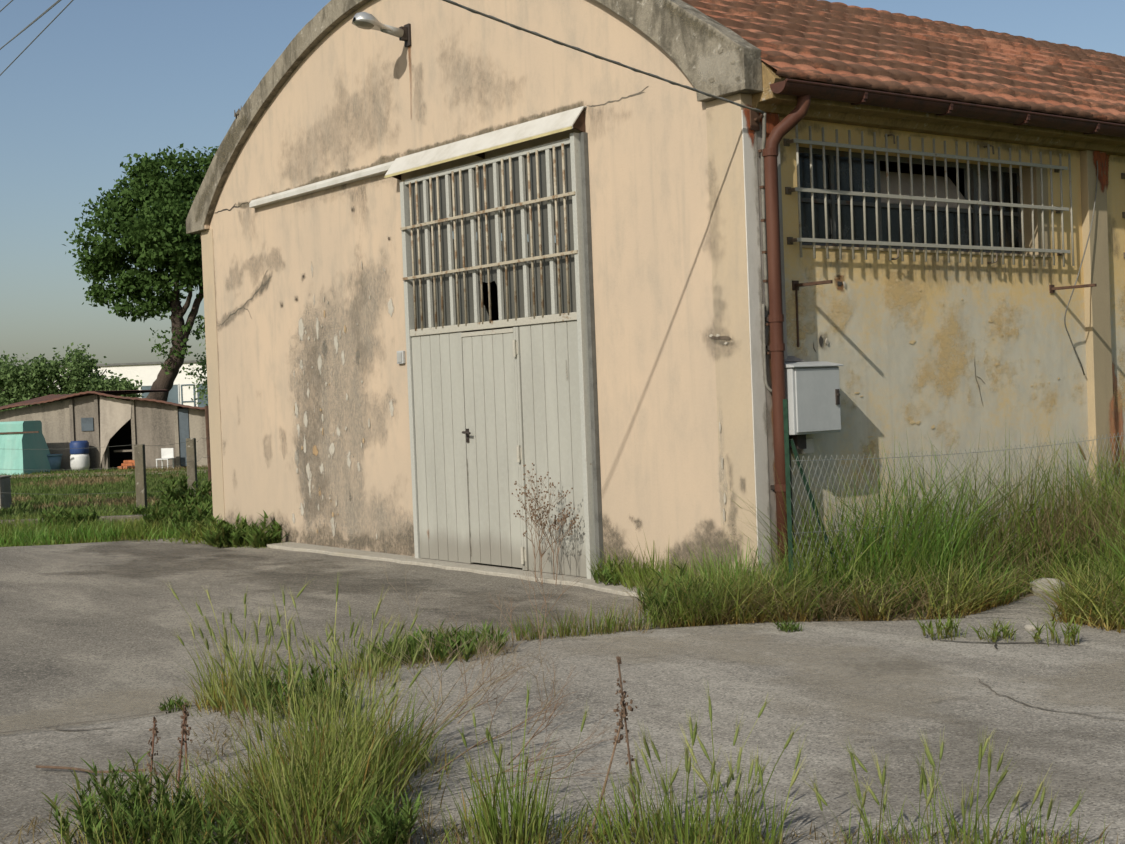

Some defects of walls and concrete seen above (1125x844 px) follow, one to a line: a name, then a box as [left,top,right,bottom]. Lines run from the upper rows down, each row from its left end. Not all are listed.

crack [587,86,648,107]
corrosion [1093,151,1110,192]
crack [220,270,272,325]
corrosion [1110,363,1125,492]
leakage [260,520,414,555]
leakage [603,521,640,575]
leakage [669,494,739,573]